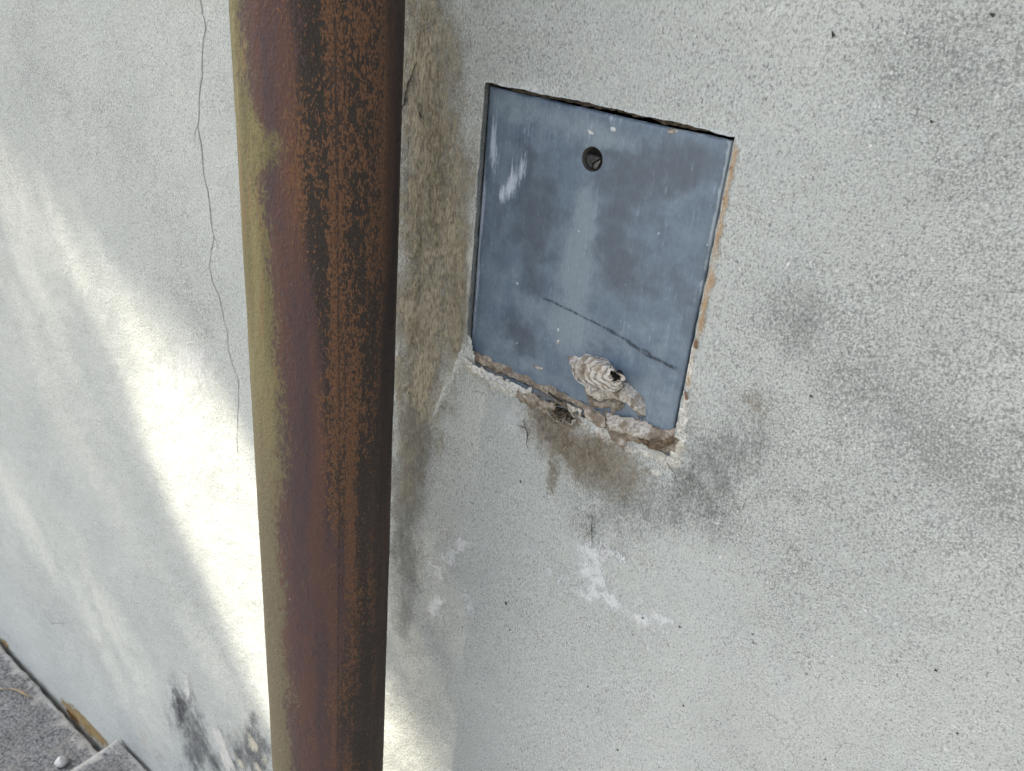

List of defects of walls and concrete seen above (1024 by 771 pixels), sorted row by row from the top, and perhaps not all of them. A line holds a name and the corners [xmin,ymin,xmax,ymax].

crack [194,0,239,500]
spalling [532,343,695,477]
water stain [546,528,676,633]
water stain [172,673,271,771]